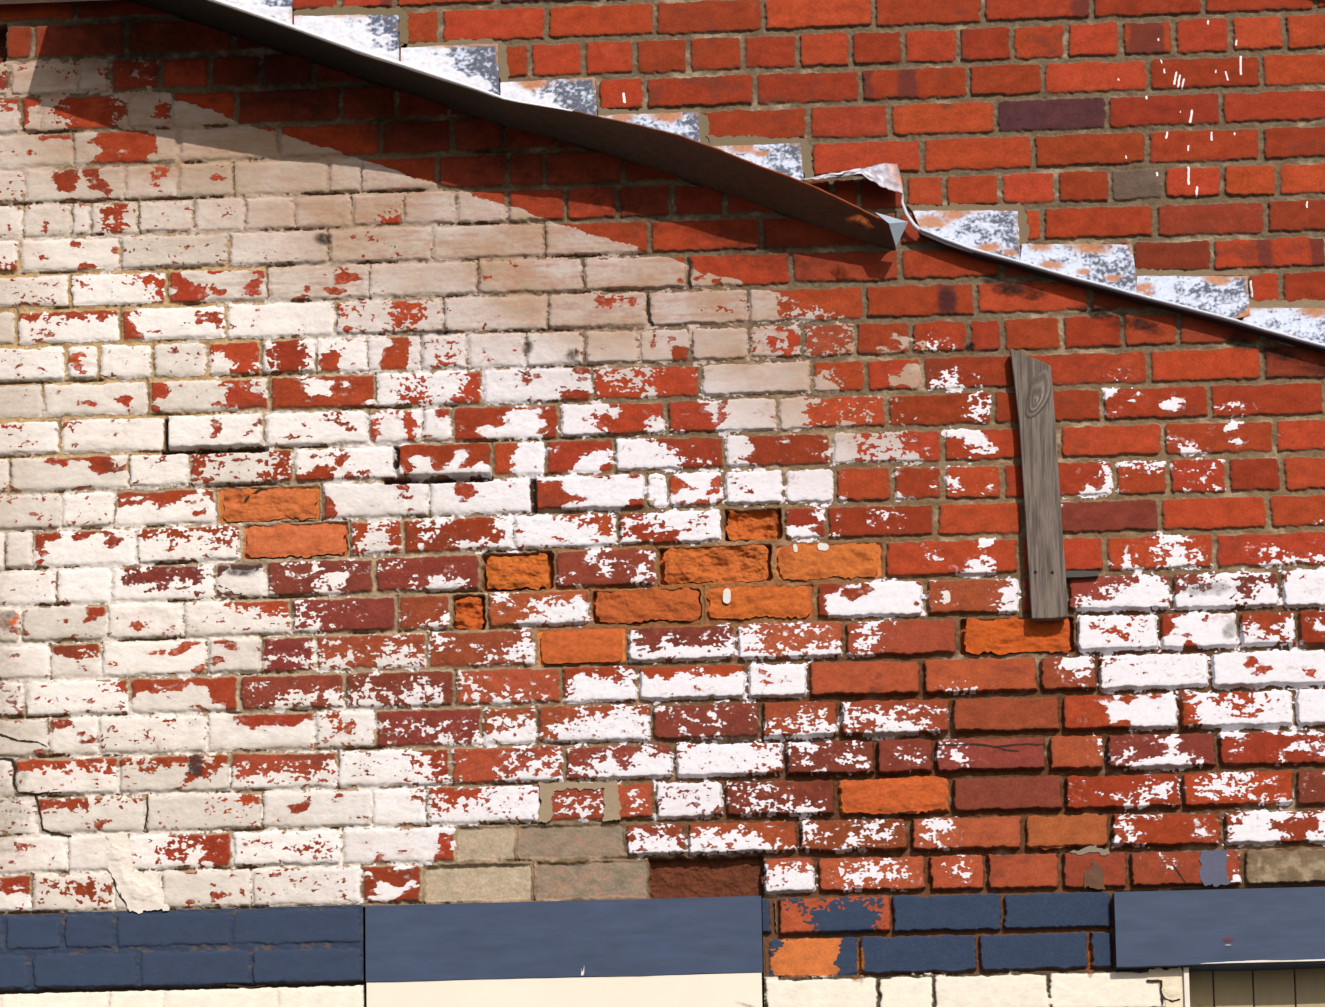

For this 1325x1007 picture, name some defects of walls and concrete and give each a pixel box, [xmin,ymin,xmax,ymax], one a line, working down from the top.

peeling [0,56,999,977]
crack [0,733,72,837]
peeling [955,531,1325,883]